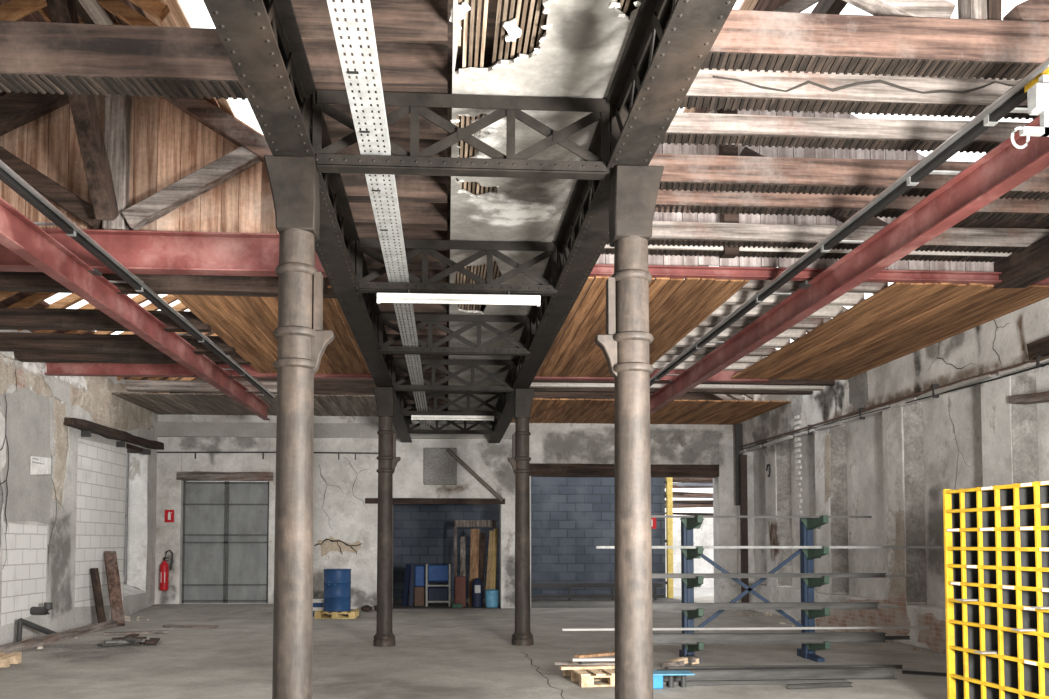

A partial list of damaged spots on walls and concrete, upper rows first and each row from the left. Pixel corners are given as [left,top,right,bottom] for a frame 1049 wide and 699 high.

peeling [449,0,552,69]
water stain [562,11,595,50]
peeling [608,0,641,18]
crack [713,76,1014,94]
water stain [468,178,555,226]
spalling [0,353,154,511]